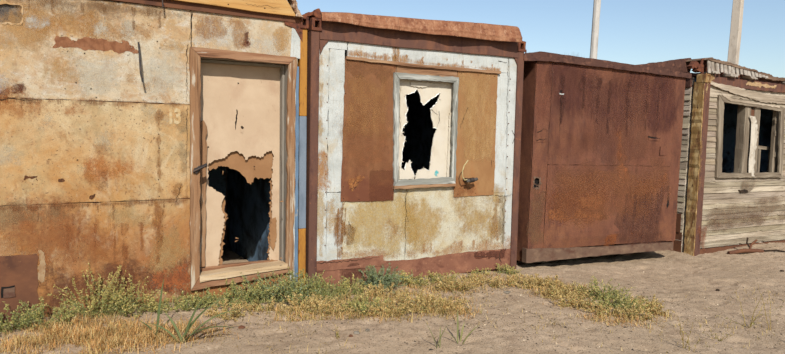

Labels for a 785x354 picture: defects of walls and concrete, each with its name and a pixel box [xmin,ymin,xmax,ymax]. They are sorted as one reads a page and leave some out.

peeling [53,23,138,54]
rust [317,152,437,259]
rust [458,189,506,242]
rust [38,261,191,316]